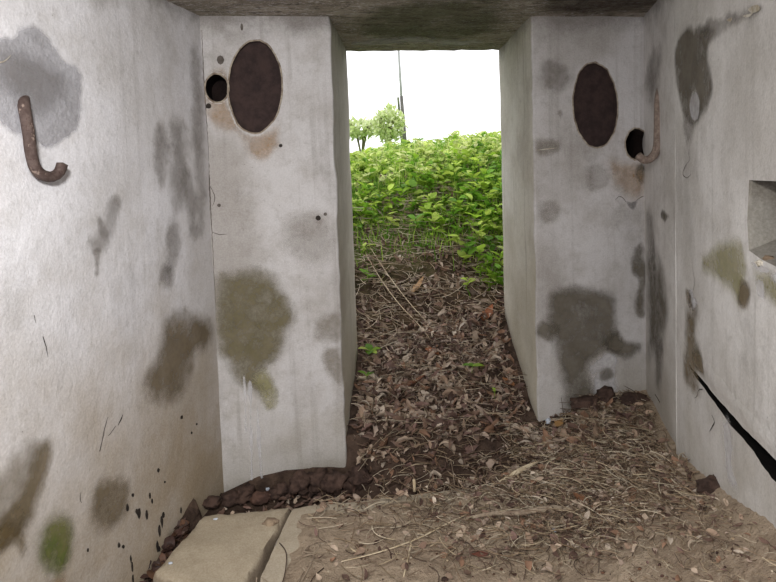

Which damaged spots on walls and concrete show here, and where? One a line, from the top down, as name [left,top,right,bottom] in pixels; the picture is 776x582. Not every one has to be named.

water stain [675,26,712,124]
water stain [148,274,291,409]
water stain [538,289,639,407]
crack [694,372,776,482]
water stain [0,443,50,551]
water stain [156,512,165,552]